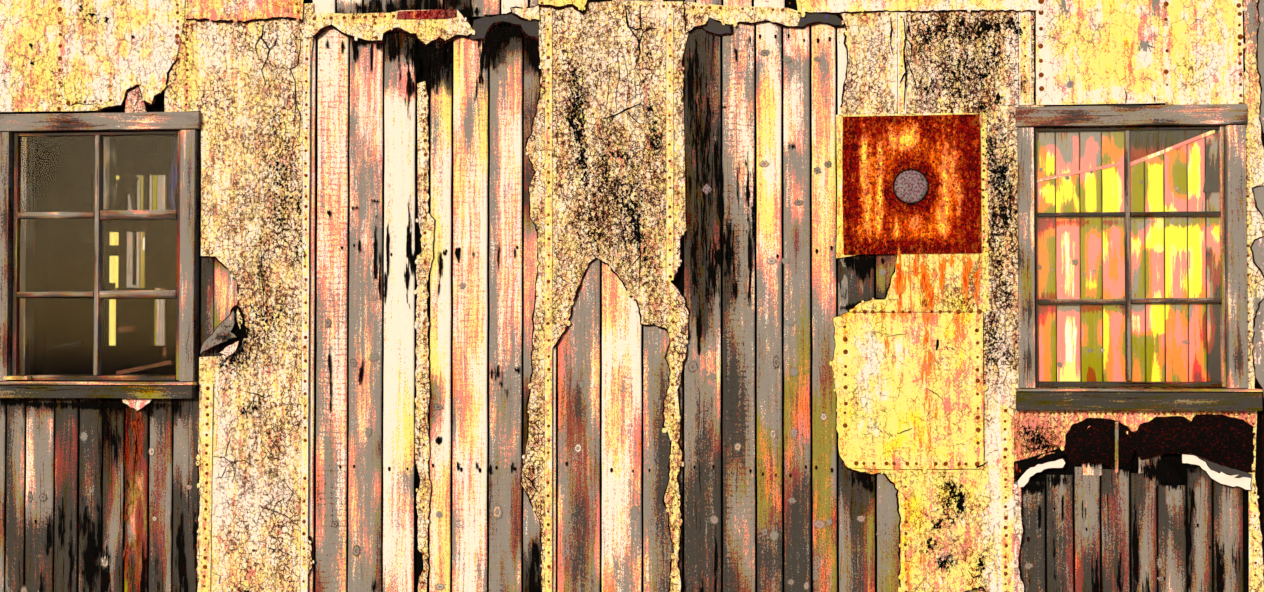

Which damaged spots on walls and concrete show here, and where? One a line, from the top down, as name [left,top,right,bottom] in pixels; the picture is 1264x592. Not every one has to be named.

peeling [1241,0,1264,141]
water stain [565,53,665,292]
water stain [915,15,1026,366]
peeling [299,536,314,589]
peeling [313,0,589,592]
peeling [553,230,690,592]
peeling [829,254,964,592]
corrosion [894,249,980,431]
water stain [921,479,967,573]
peeling [1016,414,1264,592]
peeling [1252,298,1264,400]